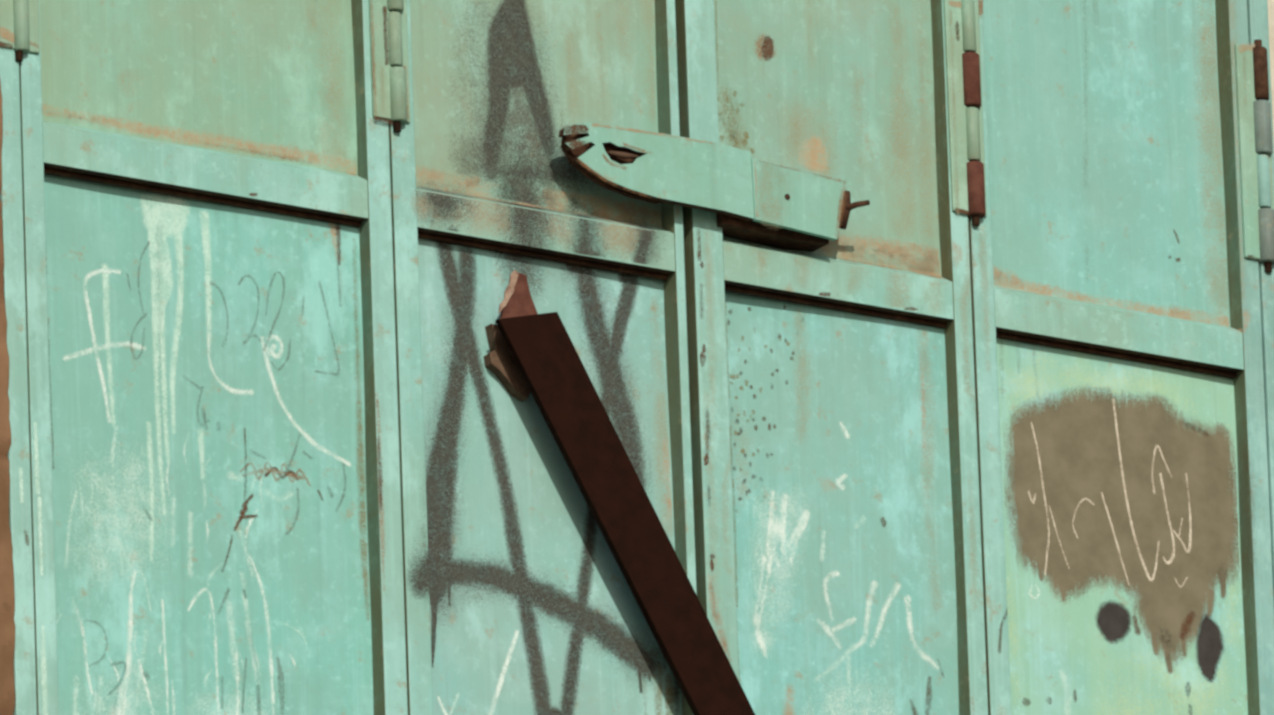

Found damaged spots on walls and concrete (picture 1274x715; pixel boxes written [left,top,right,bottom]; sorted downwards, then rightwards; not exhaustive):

corrosion [0,27,14,49]
corrosion [42,104,371,177]
corrosion [415,0,1252,426]
corrosion [483,270,814,715]